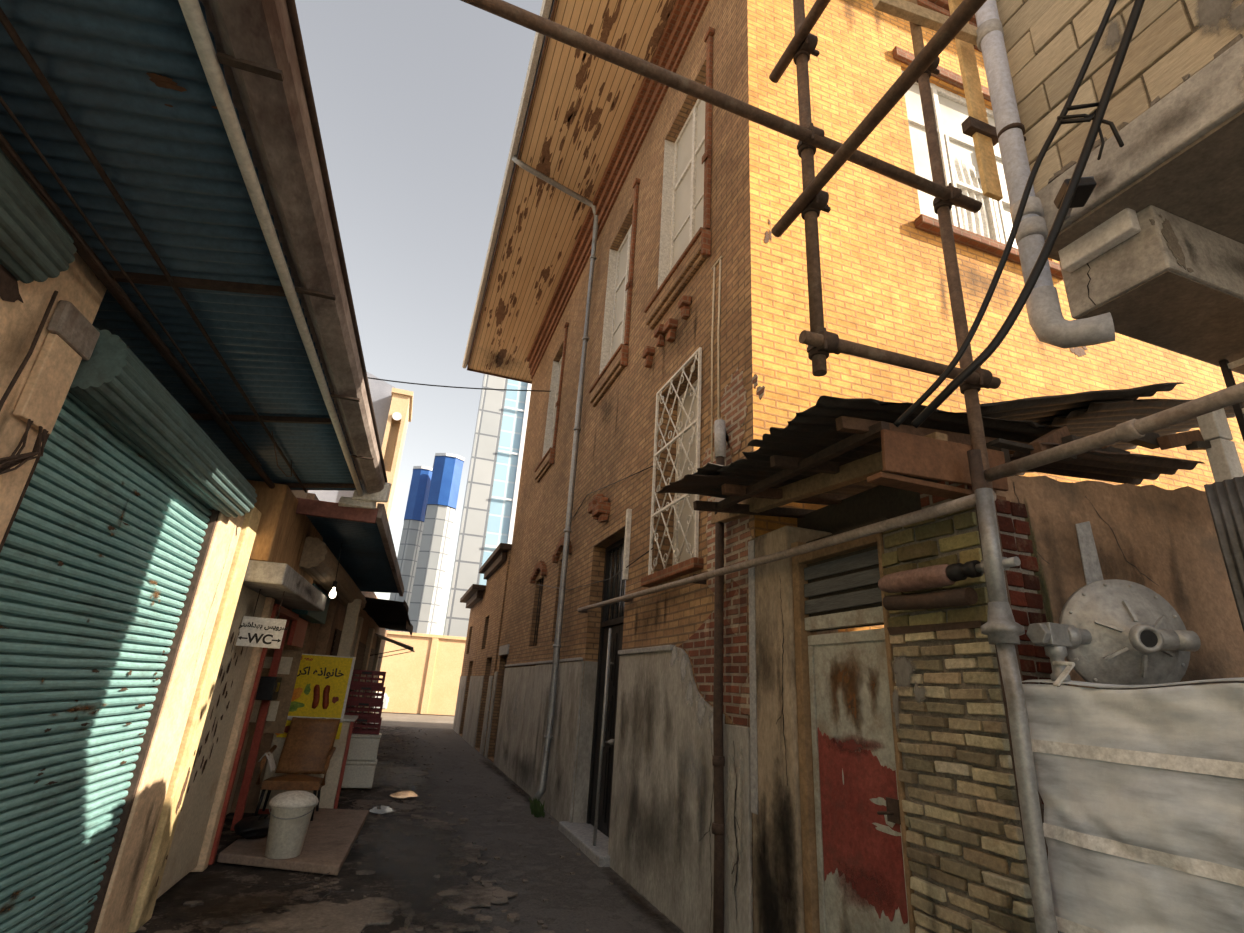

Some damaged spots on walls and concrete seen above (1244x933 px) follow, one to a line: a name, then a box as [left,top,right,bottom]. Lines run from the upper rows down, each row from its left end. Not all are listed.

peeling [586,0,636,50]
peeling [644,0,676,62]
peeling [484,49,642,370]
spalling [0,264,23,303]
crack [1087,263,1096,306]
rust [50,703,106,730]
rust [830,663,877,730]
damp [756,793,795,933]